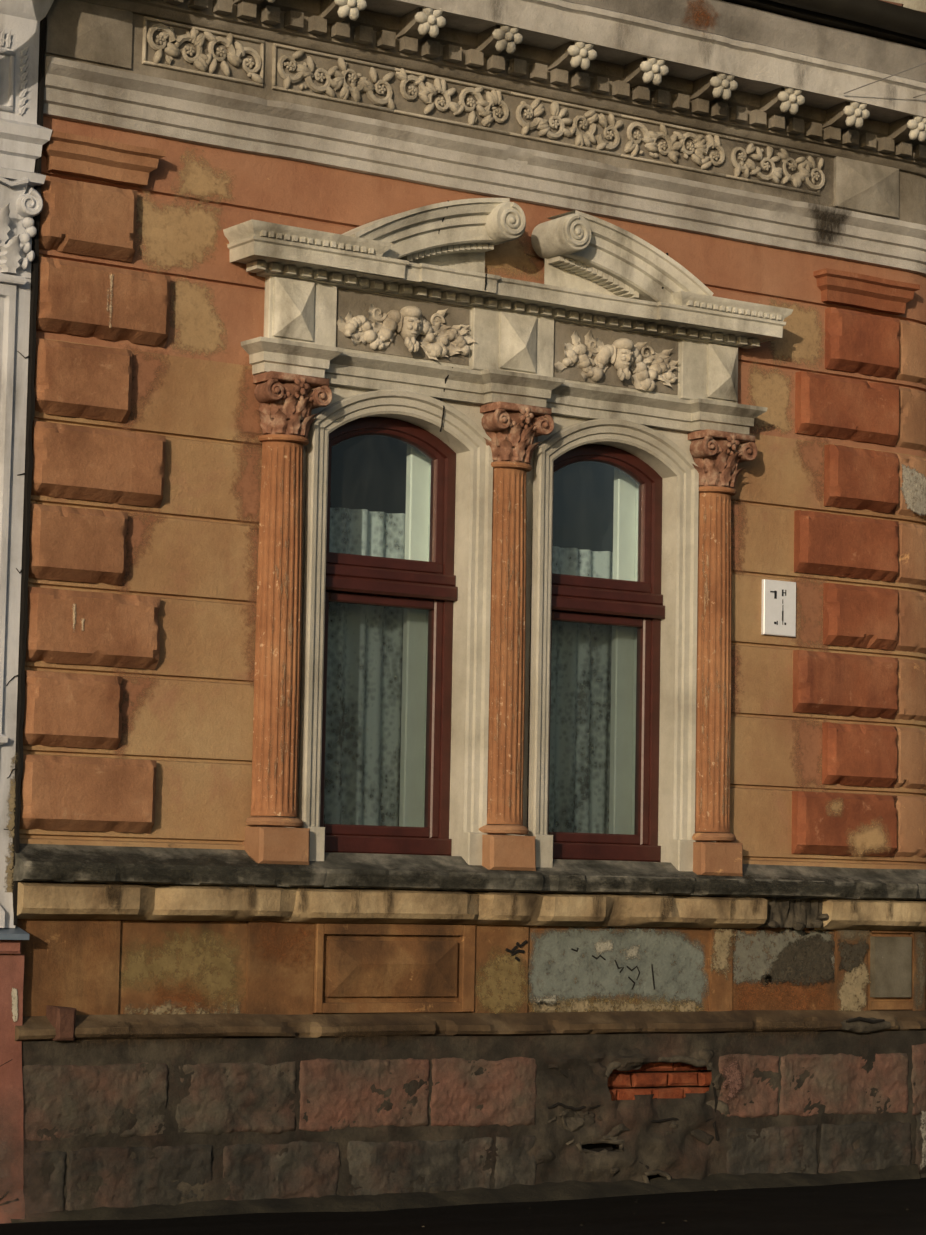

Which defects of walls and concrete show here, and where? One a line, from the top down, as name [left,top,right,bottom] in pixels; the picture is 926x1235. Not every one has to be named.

spalling [901,464,926,515]
flaking render [475,927,708,1014]
peeling [732,928,870,1011]
spalling [535,1048,730,1176]
crack [0,1194,19,1206]